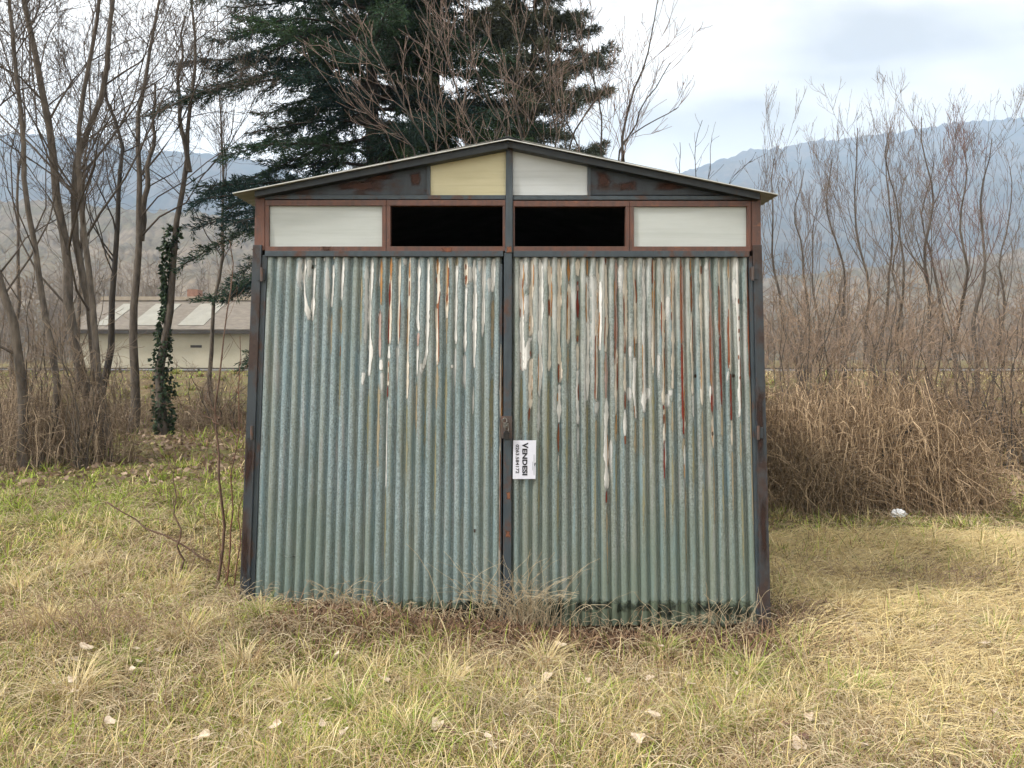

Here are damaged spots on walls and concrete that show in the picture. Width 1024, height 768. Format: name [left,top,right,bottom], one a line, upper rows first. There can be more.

peeling [297,257,345,406]
peeling [360,258,440,510]
rust [442,247,452,344]
peeling [519,258,675,573]
rust [680,258,694,563]
peeling [699,259,715,539]